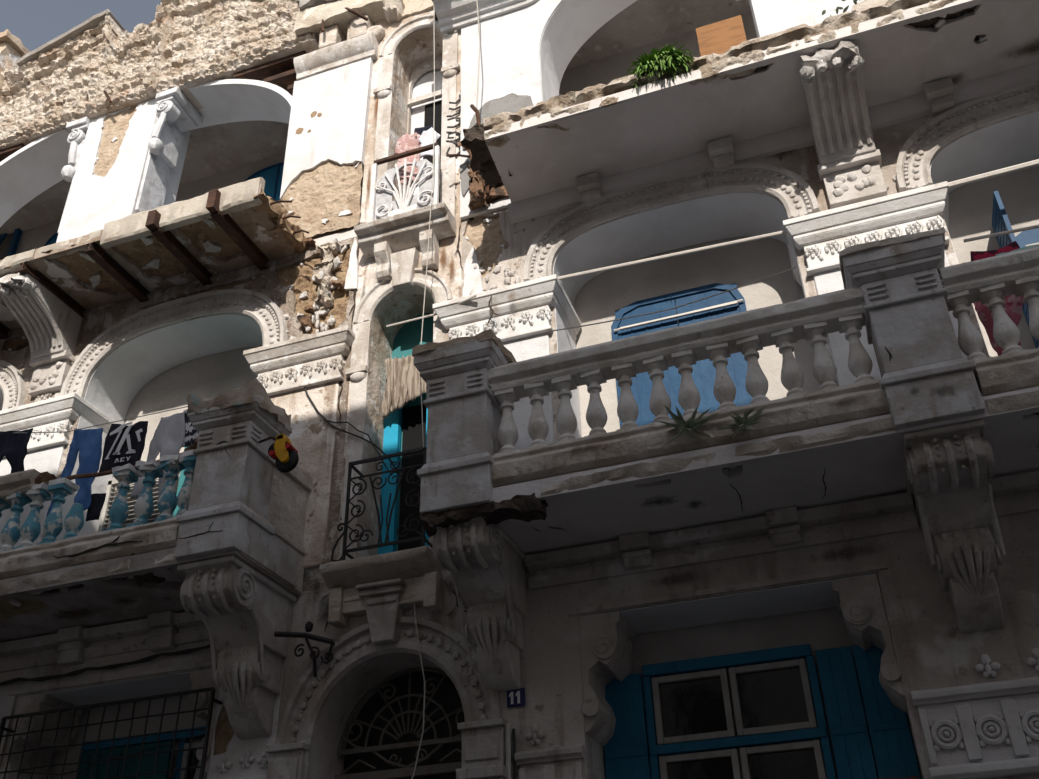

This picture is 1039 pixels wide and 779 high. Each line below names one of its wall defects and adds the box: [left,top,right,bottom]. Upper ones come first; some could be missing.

spalling [907,5,977,28]
flaking render [94,90,137,177]
spalling [446,104,515,278]
spalling [46,245,129,293]
spalling [113,235,188,278]
spalling [178,218,243,259]
flaking render [253,161,363,334]
crack [487,294,499,325]
spalling [420,493,547,538]
crack [52,536,142,558]